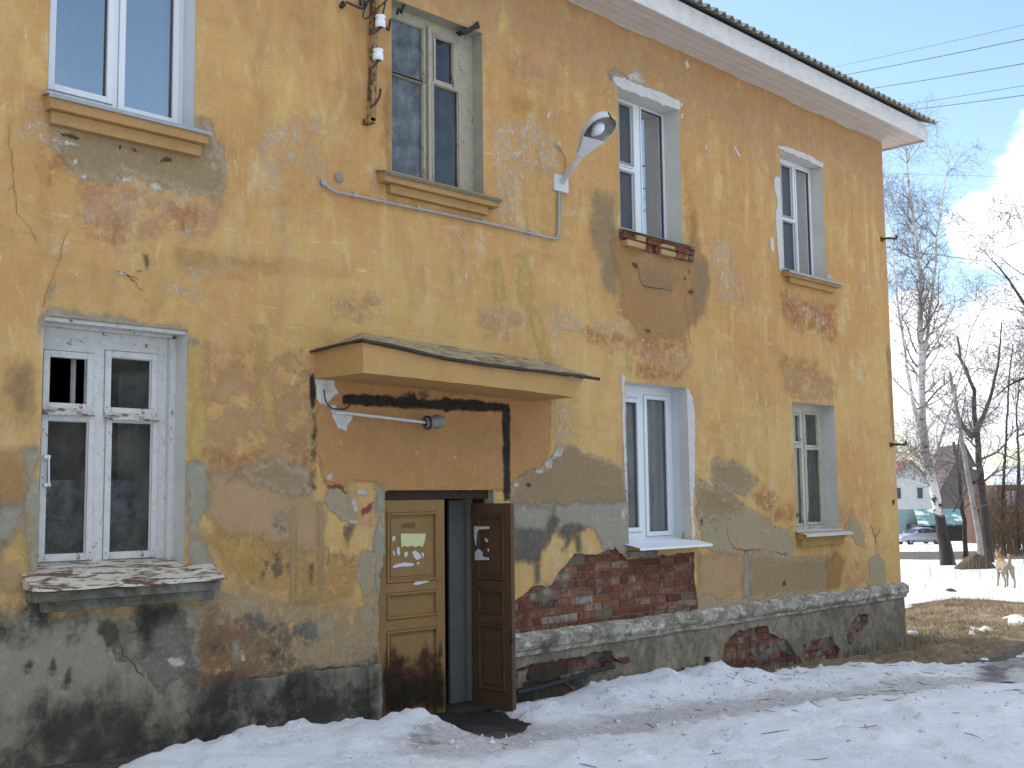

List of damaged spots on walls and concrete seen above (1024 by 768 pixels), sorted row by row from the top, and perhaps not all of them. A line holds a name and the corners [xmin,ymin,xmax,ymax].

flaking render [49,116,227,200]
crack [8,124,67,307]
flaking render [185,460,369,566]
flaking render [510,444,627,519]
spalling [515,479,844,634]
water stain [23,603,50,627]
water stain [98,620,118,647]
spalling [722,614,867,670]
water stain [0,671,377,768]